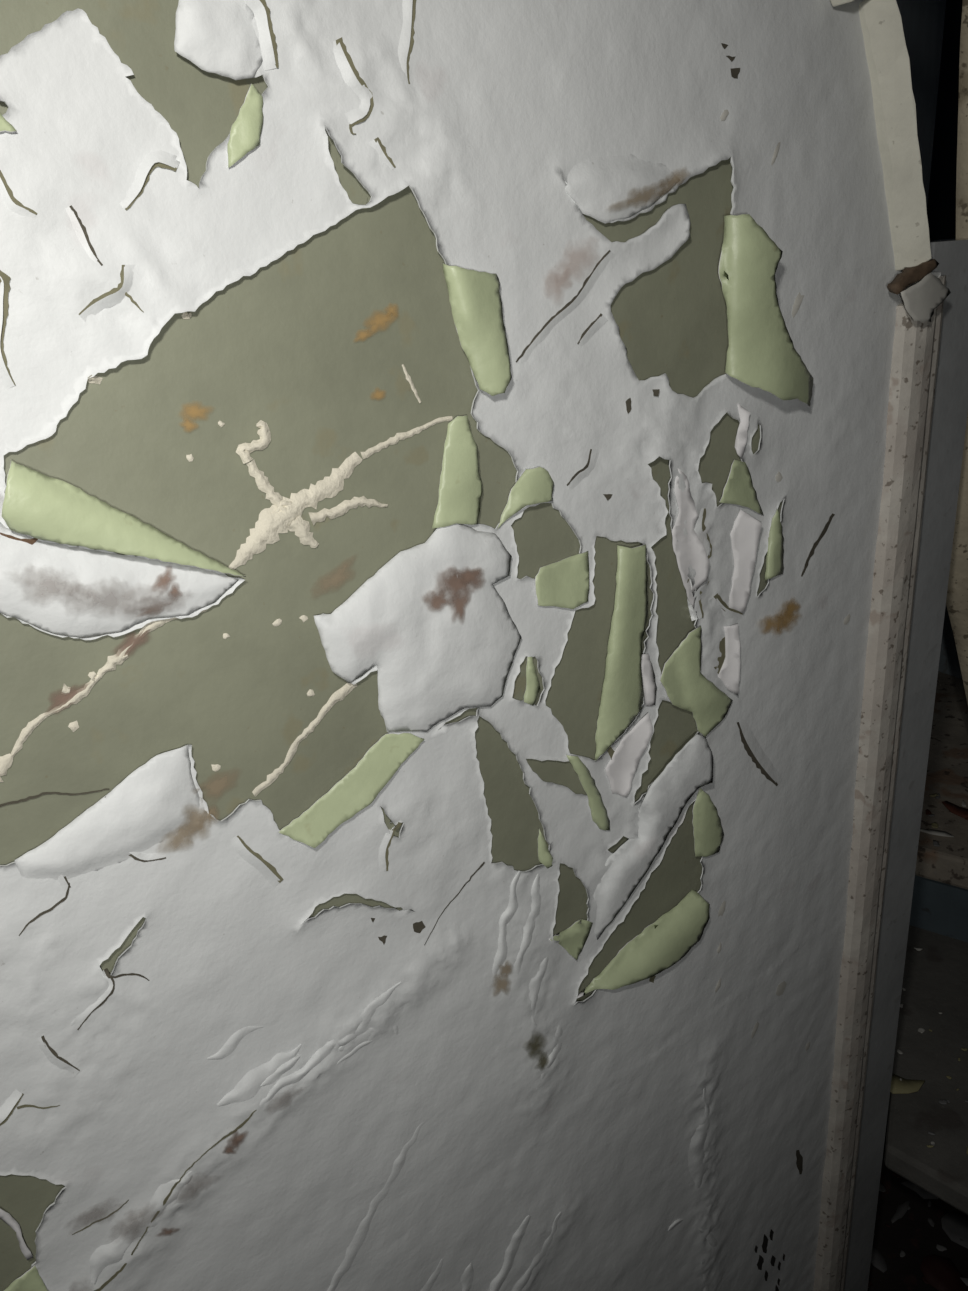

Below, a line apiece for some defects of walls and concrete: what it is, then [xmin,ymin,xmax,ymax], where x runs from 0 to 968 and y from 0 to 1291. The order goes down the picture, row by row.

crack [398,0,416,84]
peeling [0,0,265,188]
crack [333,37,396,170]
peeling [0,142,814,999]
corrosion [426,570,482,618]
corrosion [765,603,799,631]
water stain [51,688,82,709]
crack [737,719,783,786]
peeling [0,1174,63,1291]